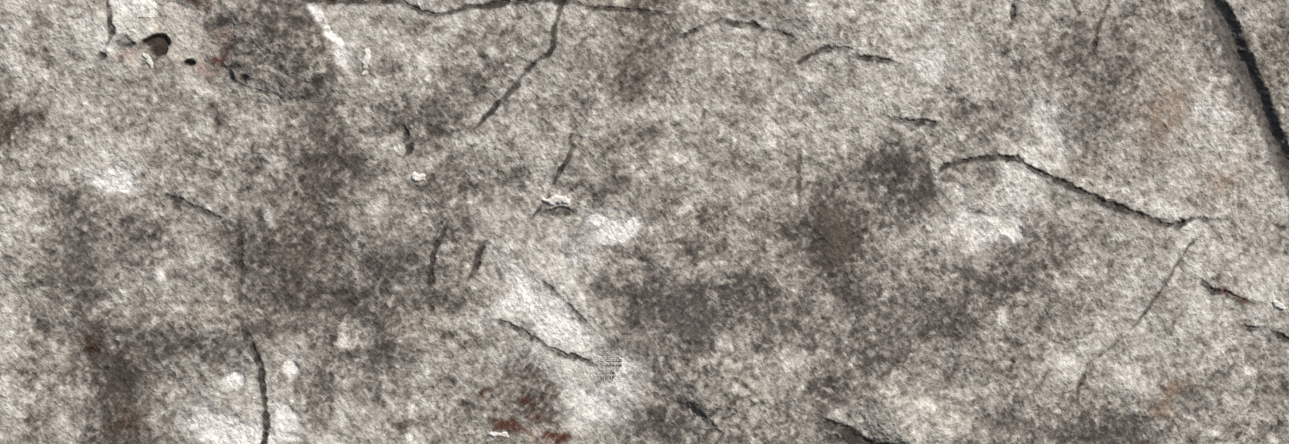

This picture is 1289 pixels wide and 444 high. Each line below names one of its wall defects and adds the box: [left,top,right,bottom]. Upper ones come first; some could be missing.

crack [107,0,115,41]
crack [306,0,648,125]
crack [684,20,892,64]
crack [939,154,1289,342]
crack [544,283,588,324]
crack [498,320,591,365]
crack [242,327,270,444]
crack [823,419,889,444]